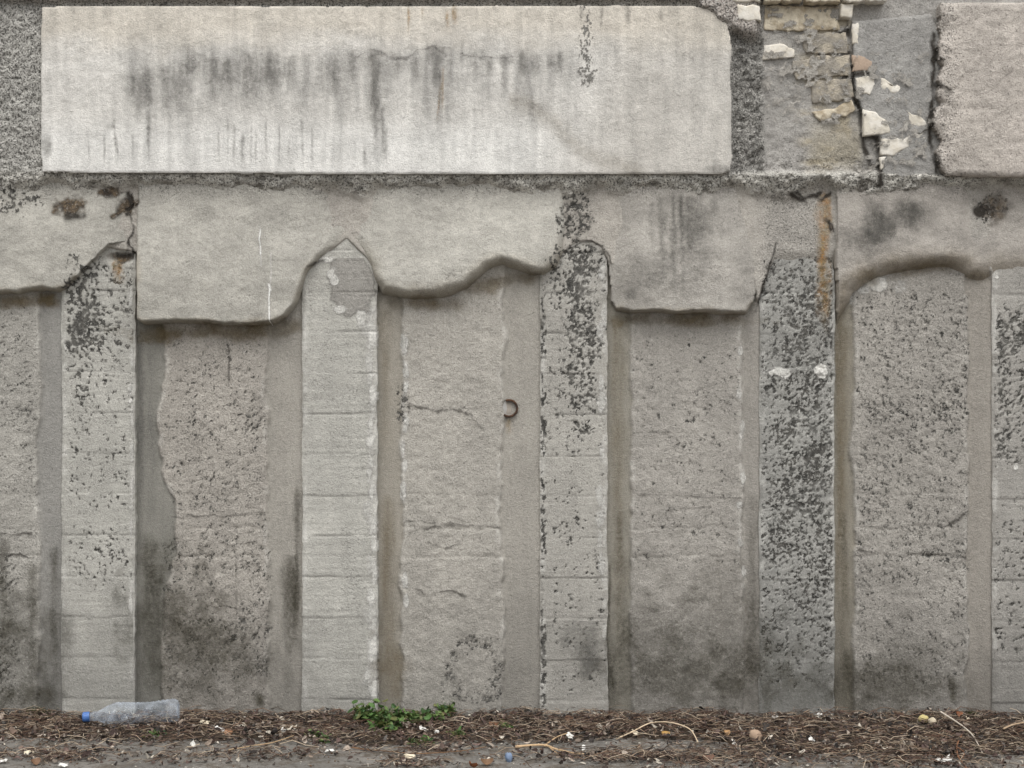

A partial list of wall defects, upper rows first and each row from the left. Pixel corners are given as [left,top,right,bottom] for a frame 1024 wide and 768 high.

water stain [370,54,379,100]
crack [818,23,883,186]